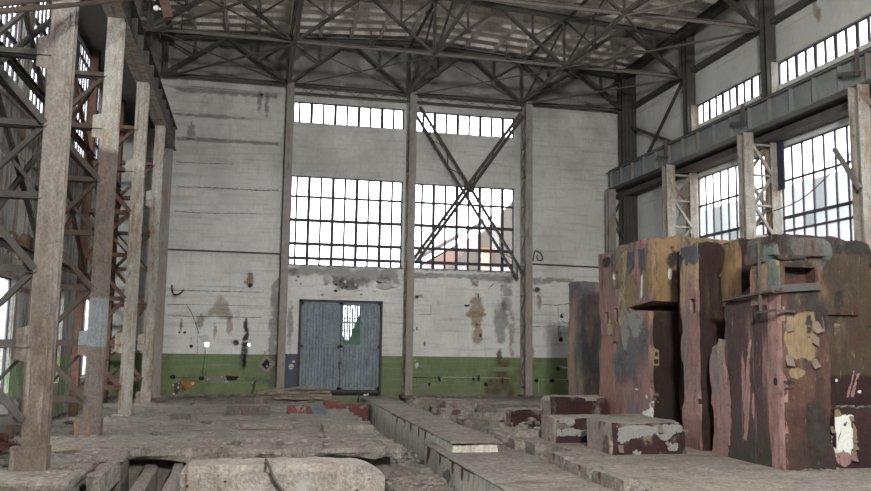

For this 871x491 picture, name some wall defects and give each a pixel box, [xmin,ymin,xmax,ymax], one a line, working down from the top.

peeling [321,276,363,296]
peeling [773,306,841,469]
peeling [830,408,859,467]